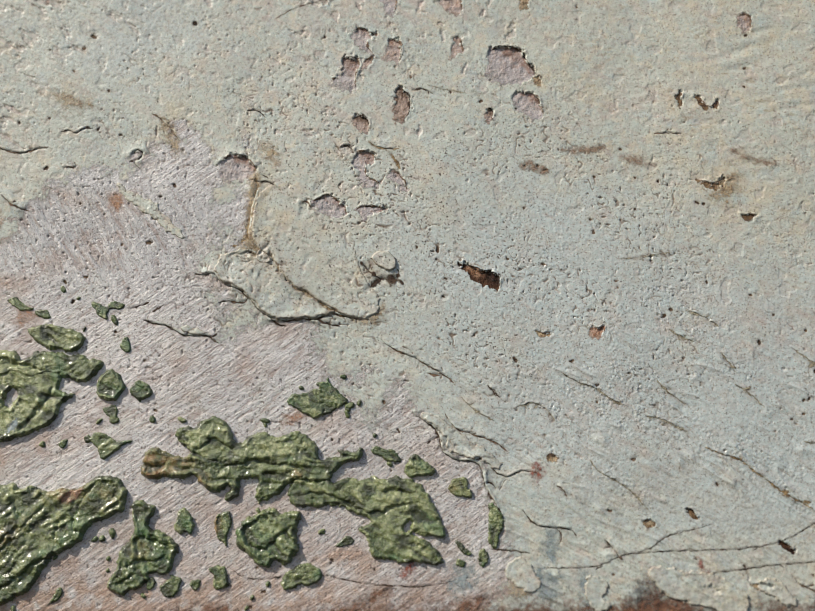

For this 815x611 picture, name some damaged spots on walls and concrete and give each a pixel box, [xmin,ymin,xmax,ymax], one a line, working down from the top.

peeling [352,113,372,135]
peeling [479,100,496,124]
crack [340,140,400,169]
crack [134,302,220,344]
peeling [0,119,541,611]
crack [195,167,578,543]
crack [669,329,694,342]
crack [685,308,720,327]
crack [720,350,765,407]
crack [563,372,690,434]
crack [491,445,815,592]
crack [323,575,452,588]